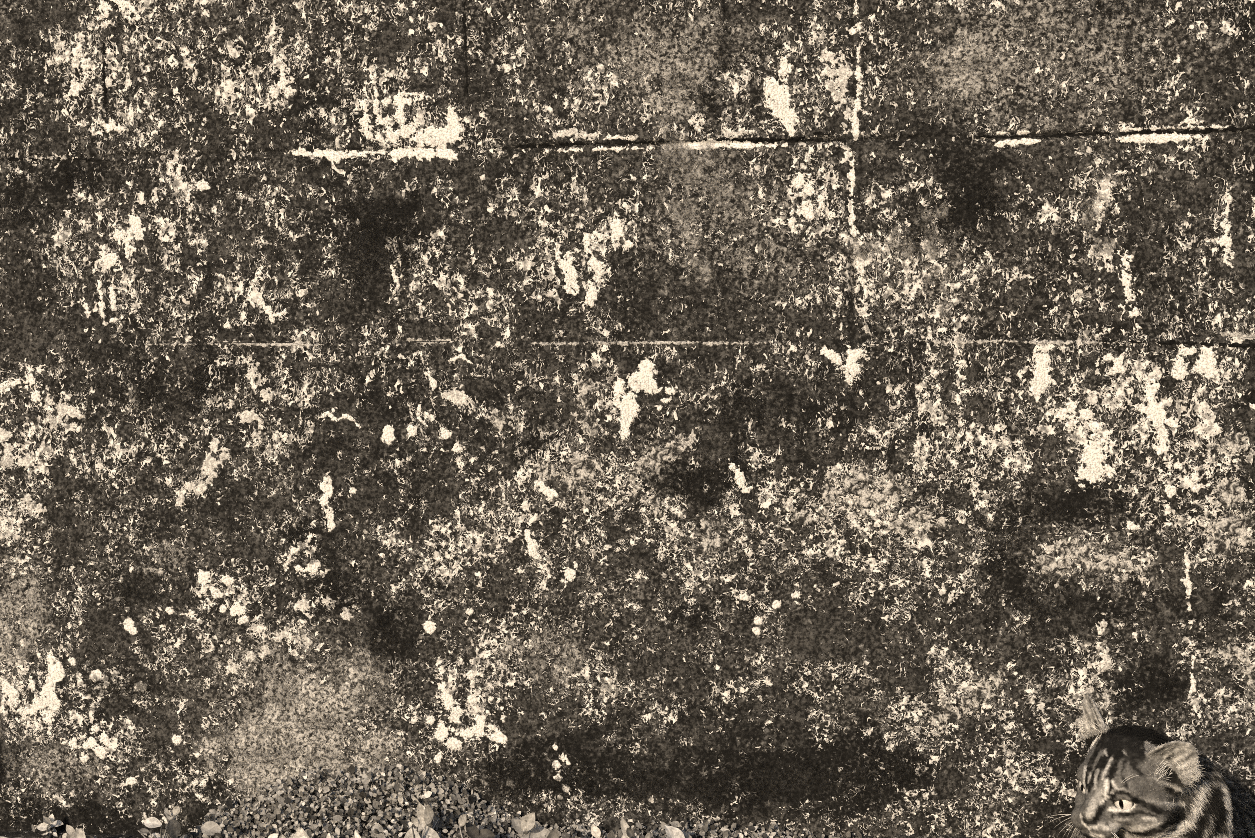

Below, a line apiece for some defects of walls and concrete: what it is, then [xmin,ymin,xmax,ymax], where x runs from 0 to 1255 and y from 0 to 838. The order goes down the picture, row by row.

leakage [339,182,440,275]
leakage [0,596,47,664]
leakage [548,639,584,690]